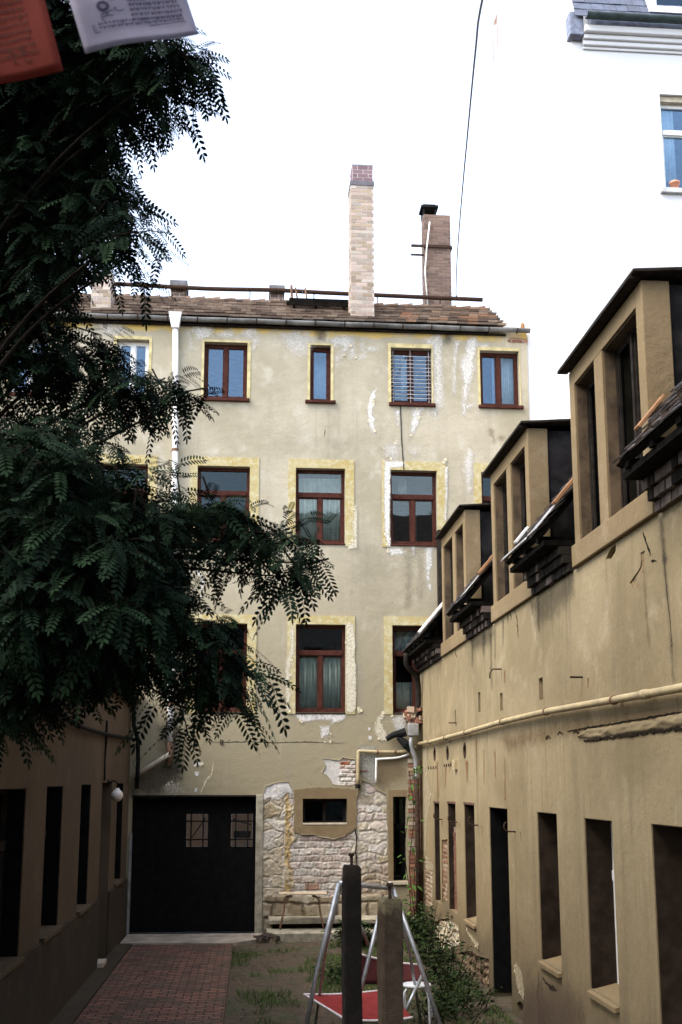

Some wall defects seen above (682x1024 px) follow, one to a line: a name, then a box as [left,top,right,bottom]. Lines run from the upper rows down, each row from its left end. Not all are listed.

flaking render [367,390,376,433]
flaking render [383,442,432,590]
crack [201,740,334,792]
flaking render [285,622,363,743]
flaking render [368,711,404,741]
flaking render [261,757,389,931]